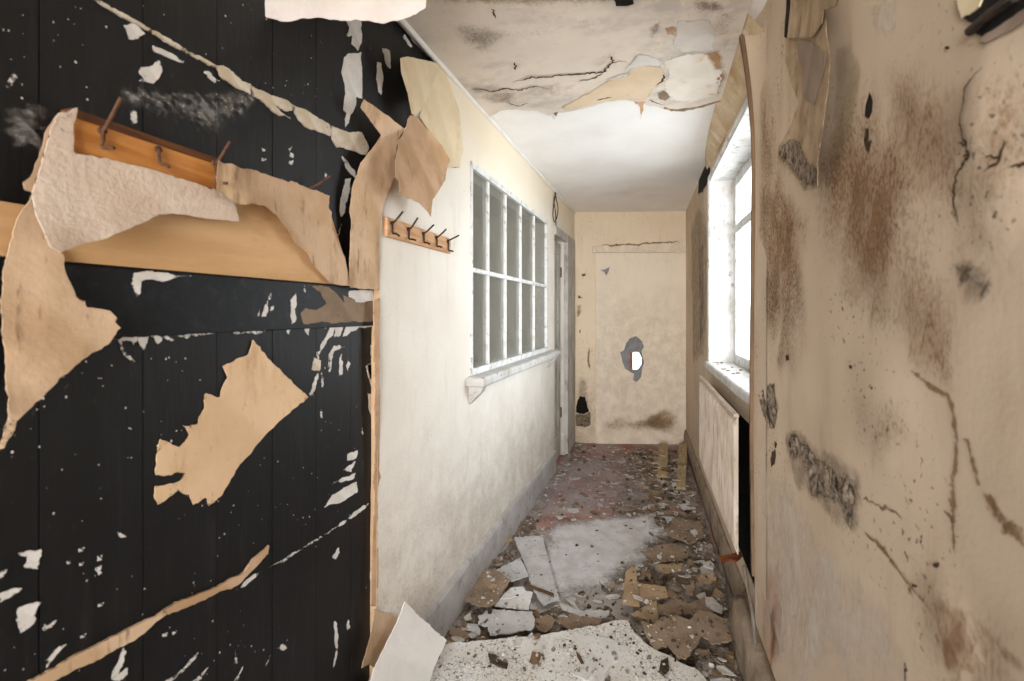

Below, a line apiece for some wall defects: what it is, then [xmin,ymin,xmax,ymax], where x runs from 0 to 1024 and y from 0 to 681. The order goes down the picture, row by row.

peeling [94,0,369,236]
crack [474,56,625,106]
peeling [396,0,751,119]
leakage [762,104,801,361]
leakage [826,133,910,273]
leakage [957,266,989,297]
crack [952,67,1024,221]
leakage [637,413,673,428]
crack [914,373,1024,549]
peeling [16,602,57,633]
peeling [28,503,369,681]
crack [866,534,921,599]